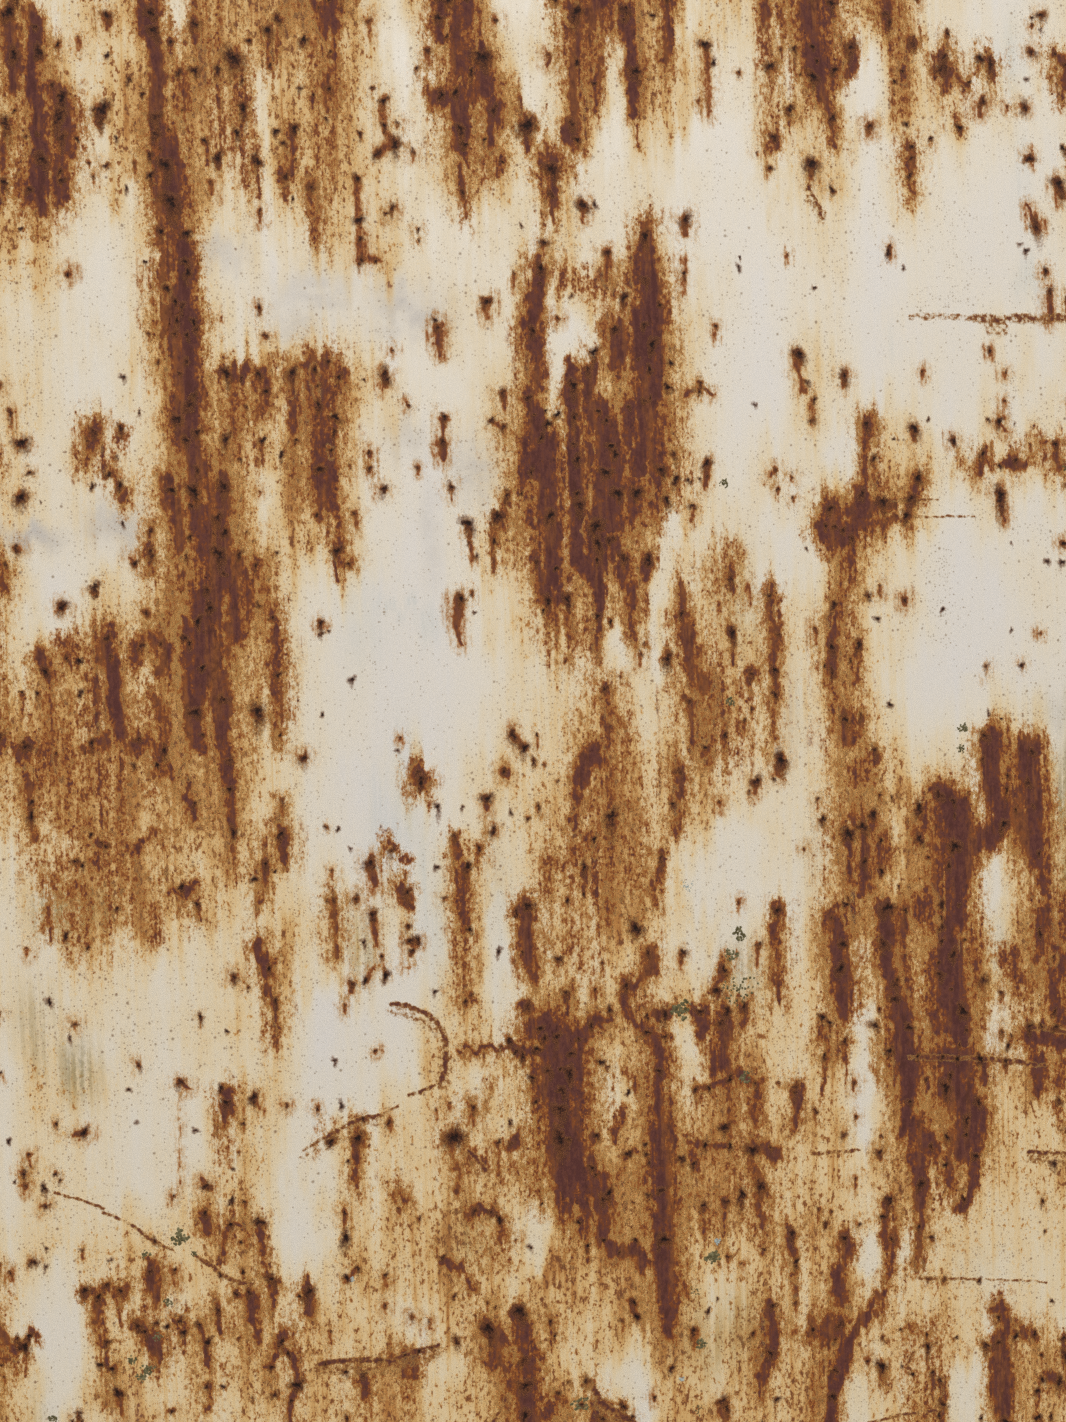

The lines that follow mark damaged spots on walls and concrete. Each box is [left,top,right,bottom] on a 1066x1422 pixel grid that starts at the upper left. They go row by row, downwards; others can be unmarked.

corrosion [0,0,428,1059]
corrosion [394,0,1066,1422]
corrosion [0,1247,49,1419]